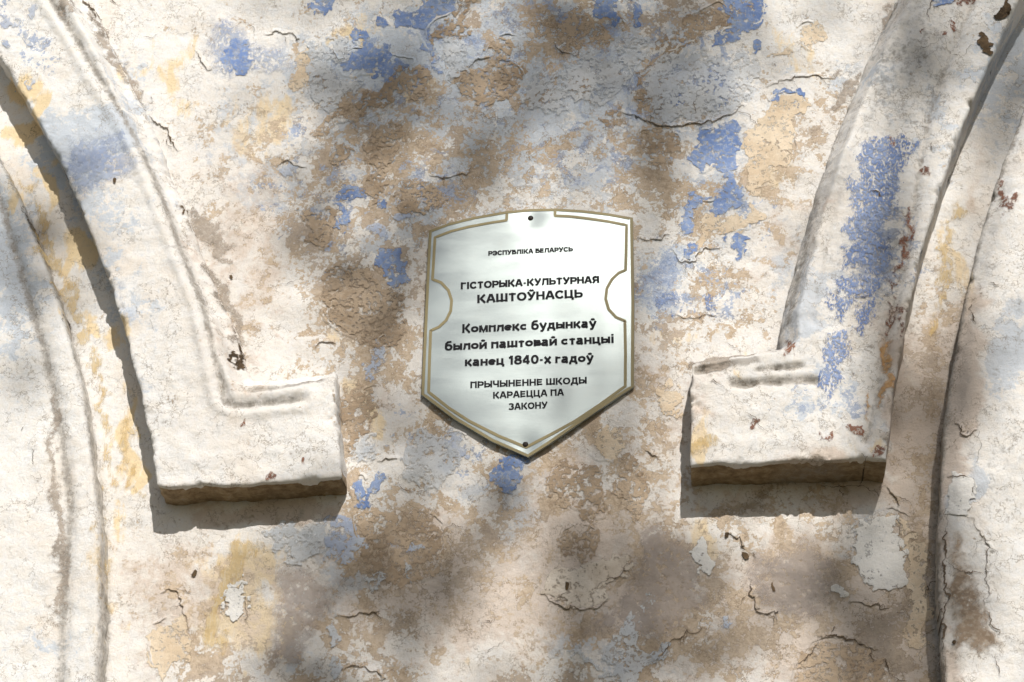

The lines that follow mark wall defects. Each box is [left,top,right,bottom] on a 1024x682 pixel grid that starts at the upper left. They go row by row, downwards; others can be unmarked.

crack [140,89,189,151]
crack [617,72,835,127]
peeling [817,133,920,399]
peeling [214,0,828,682]
crack [153,585,193,631]
crack [544,561,631,611]
crack [727,530,781,622]
crack [797,627,905,681]
peeling [846,505,935,661]
crack [924,421,1000,682]